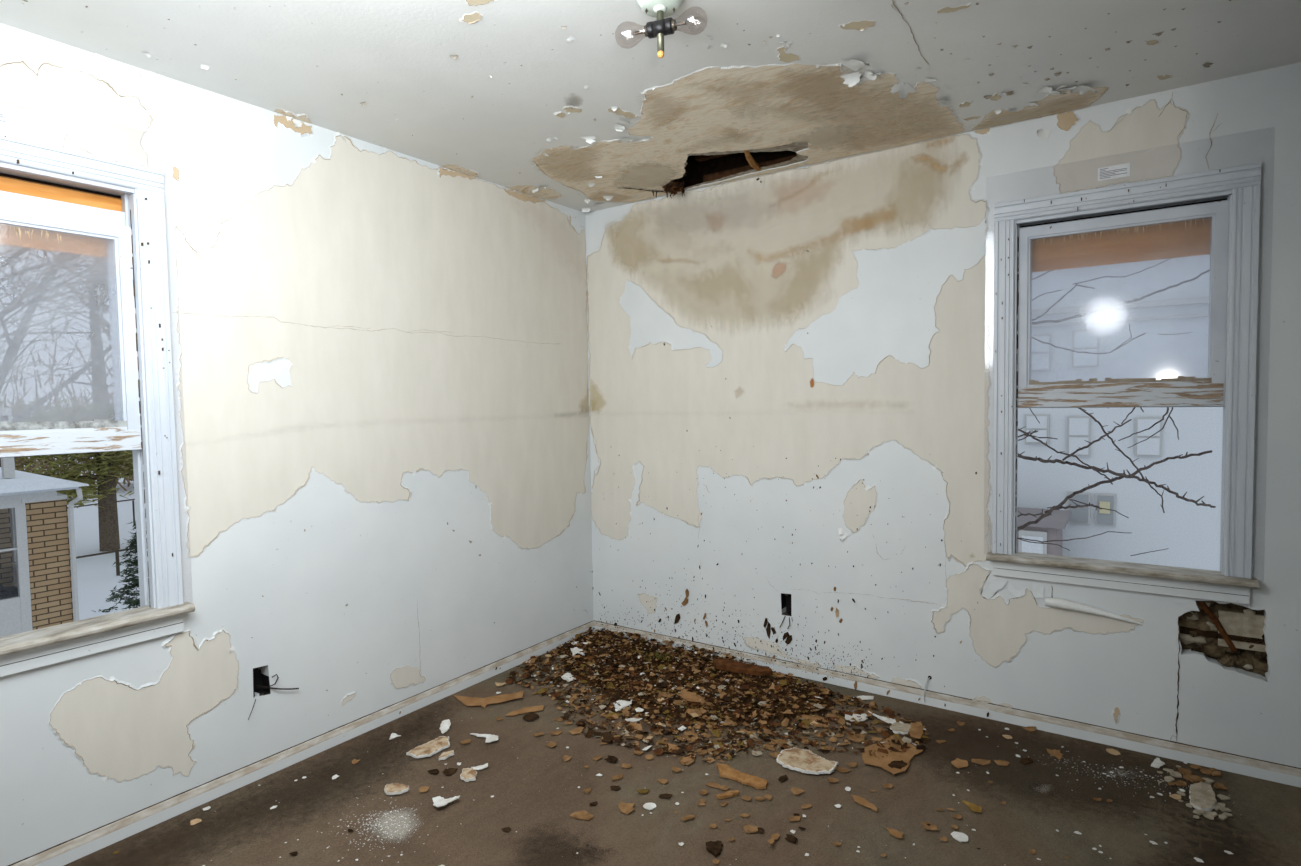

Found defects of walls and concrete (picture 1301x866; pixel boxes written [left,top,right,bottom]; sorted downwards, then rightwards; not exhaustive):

peeling [459,0,497,24]
peeling [839,20,876,31]
peeling [173,24,1191,668]
hole [1173,596,1268,677]
peeling [47,628,240,783]